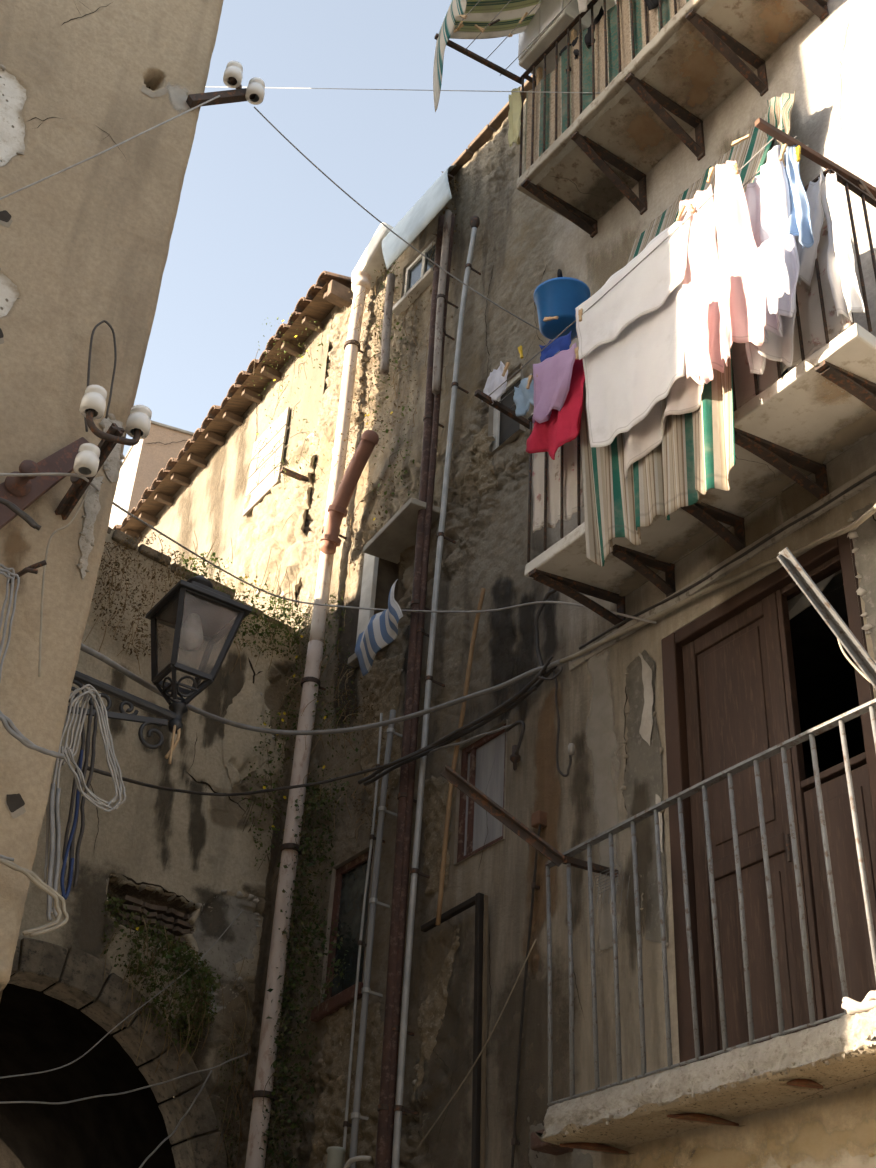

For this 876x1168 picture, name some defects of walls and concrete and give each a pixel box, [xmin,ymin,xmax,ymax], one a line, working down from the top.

flaking render [0,64,26,167]
spalling [0,210,13,228]
flaking render [0,268,20,344]
spalling [783,1034,871,1089]
spalling [527,1088,742,1168]